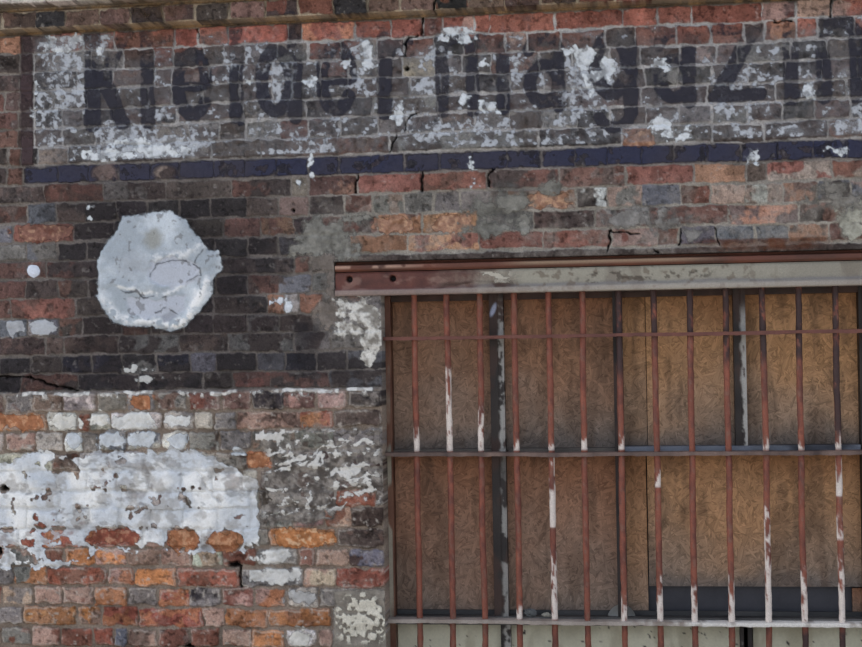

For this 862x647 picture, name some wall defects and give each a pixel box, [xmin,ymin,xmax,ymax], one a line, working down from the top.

crack [404,0,436,56]
spalling [623,129,655,148]
flaking render [332,296,382,367]
crack [0,375,79,391]
peeling [0,413,270,571]
flaking render [334,592,386,645]